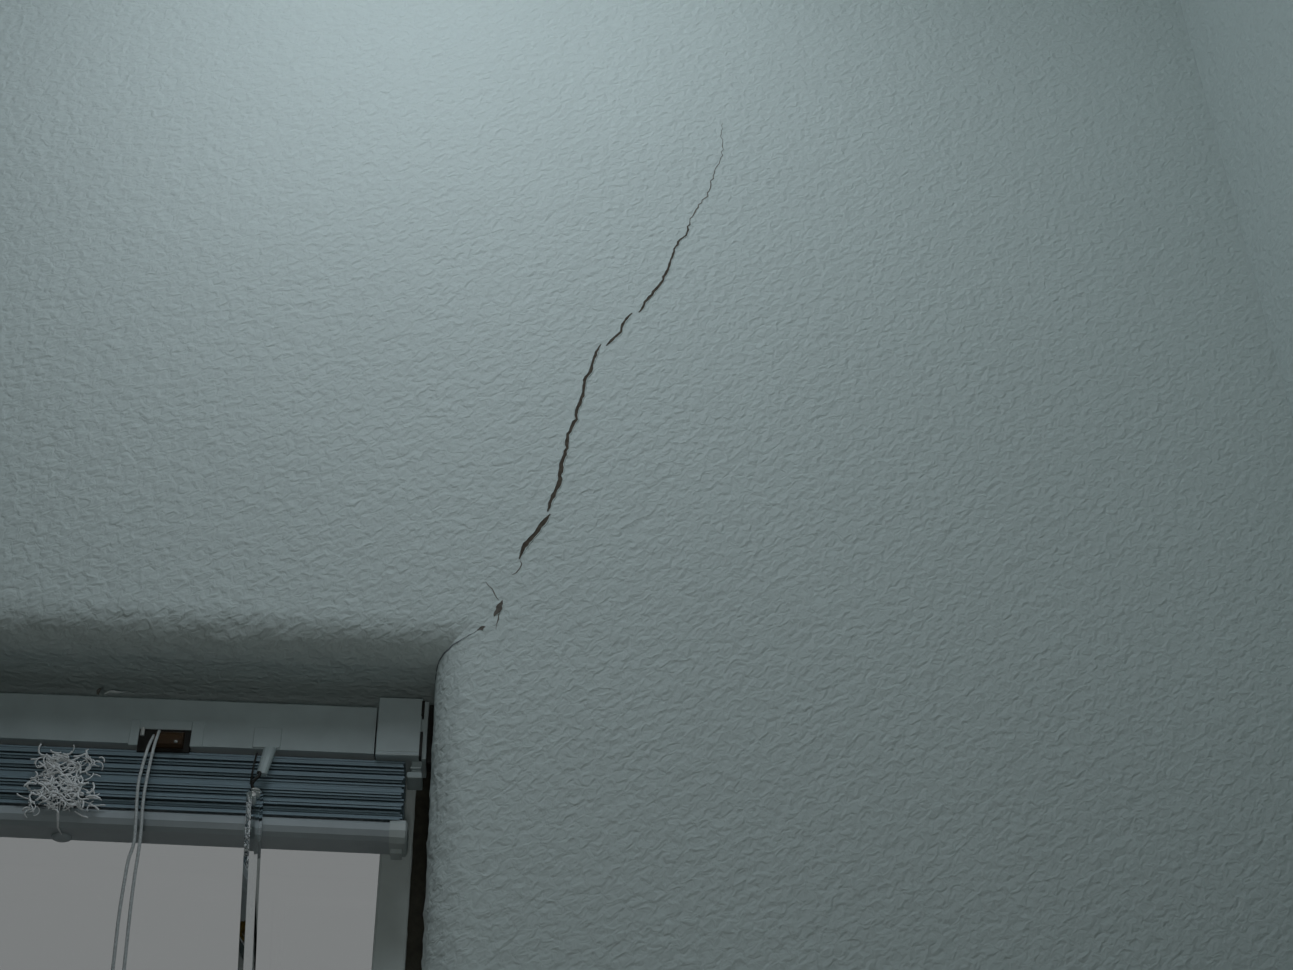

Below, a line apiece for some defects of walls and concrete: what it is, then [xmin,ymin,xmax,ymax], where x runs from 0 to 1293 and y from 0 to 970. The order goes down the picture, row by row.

crack [435,123,724,681]